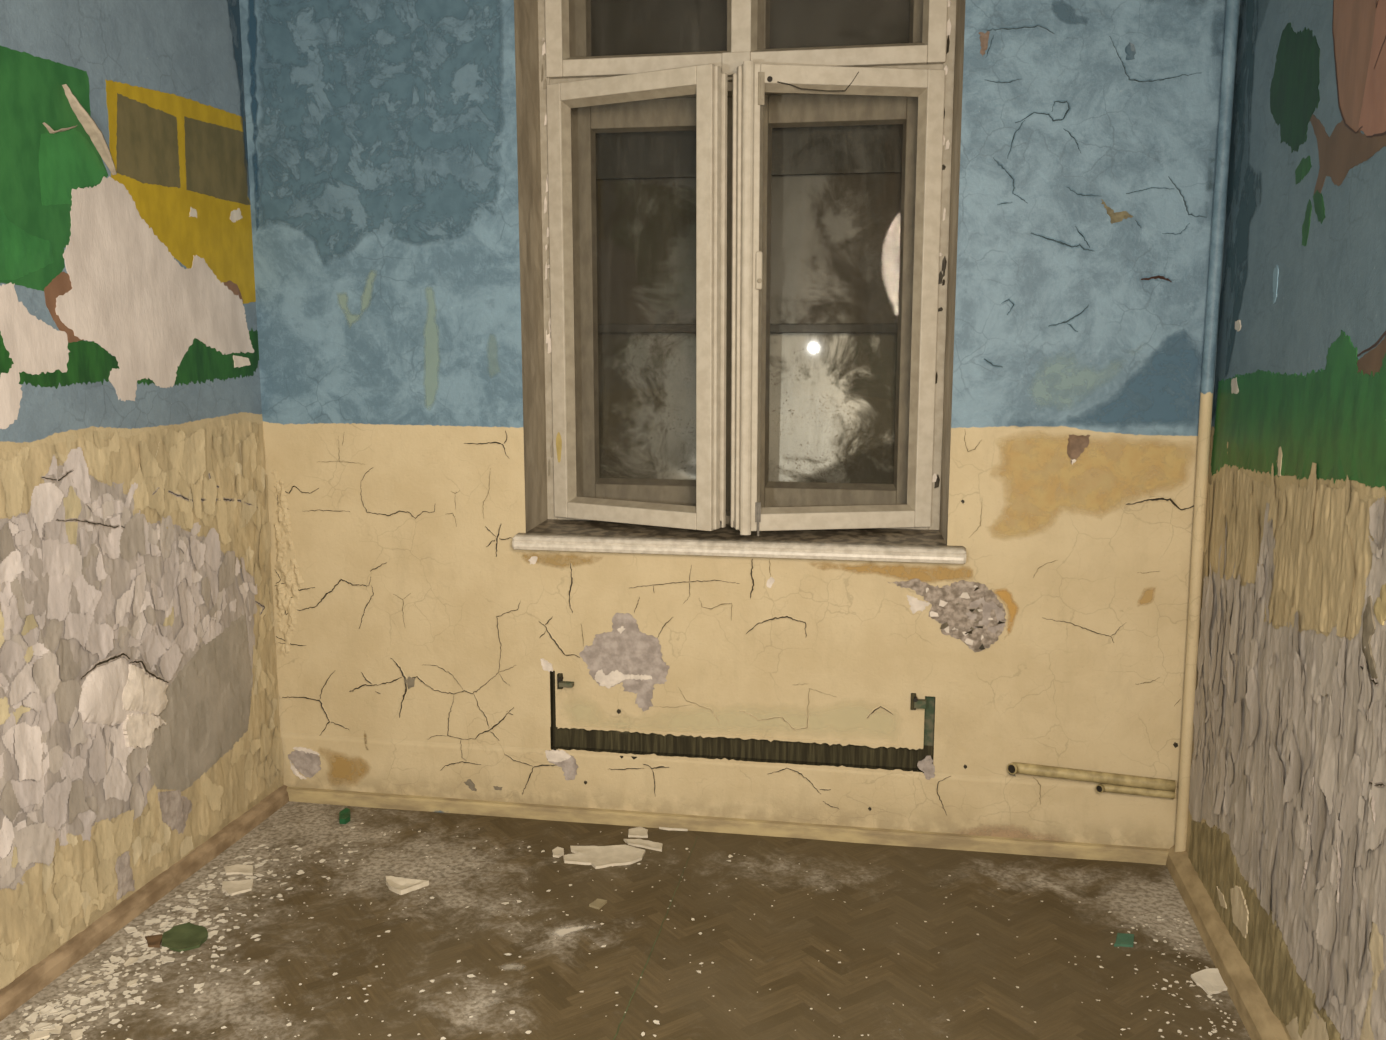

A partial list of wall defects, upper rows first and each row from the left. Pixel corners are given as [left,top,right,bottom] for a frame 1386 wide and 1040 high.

peeling [0,84,254,429]
water stain [994,0,1261,535]
crack [56,518,125,529]
crack [152,431,512,557]
crack [1126,496,1194,512]
peeling [0,419,321,989]
crack [255,562,585,795]
flaking render [579,612,670,714]
crack [629,559,808,638]
flaking render [888,578,1006,652]
peeling [1173,447,1386,1040]
peeling [21,975,106,1040]